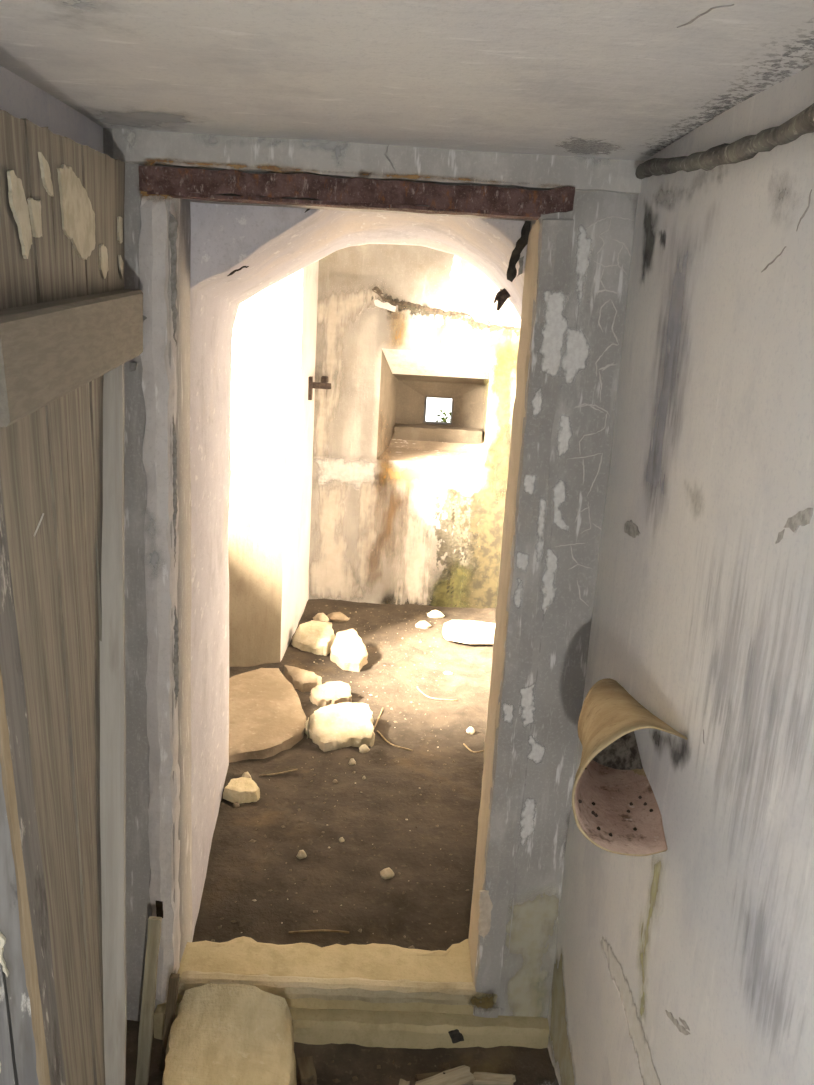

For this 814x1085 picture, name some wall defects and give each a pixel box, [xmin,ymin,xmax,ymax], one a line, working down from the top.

corrosion [147,159,314,172]
peeling [7,152,124,279]
peeling [374,300,396,312]
peeling [539,226,591,384]
peeling [532,388,542,415]
peeling [558,415,572,456]
damp [353,482,381,592]
damp [426,425,511,609]
peeling [514,475,569,614]
spalling [775,508,814,544]
peeling [503,684,545,764]
peeling [520,799,535,846]